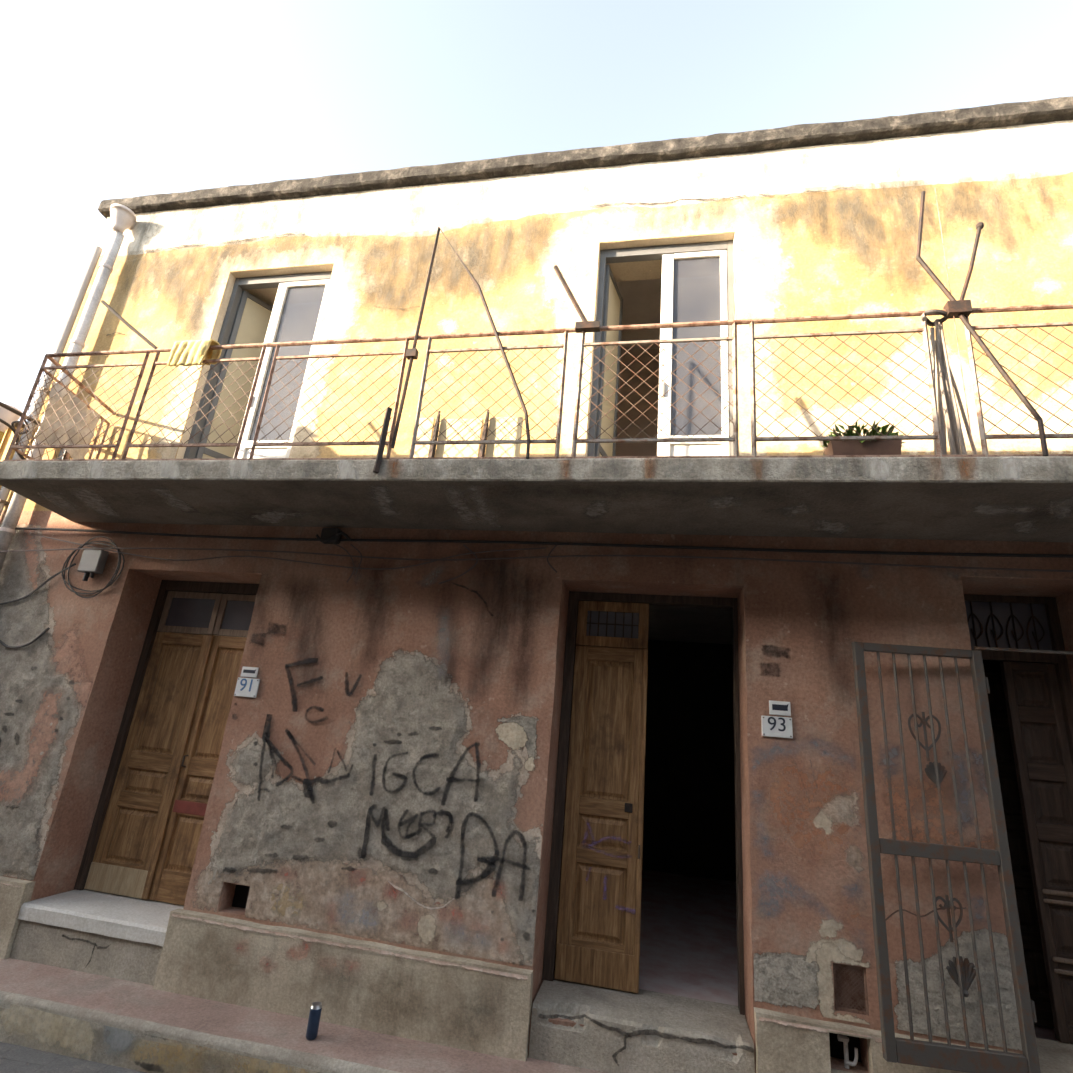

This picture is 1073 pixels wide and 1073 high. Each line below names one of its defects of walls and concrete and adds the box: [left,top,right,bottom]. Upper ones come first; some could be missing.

water stain [126,211,339,334]
water stain [358,188,549,314]
water stain [772,190,883,263]
water stain [896,168,919,280]
water stain [943,186,1014,247]
spalling [0,523,92,880]
spalling [194,649,543,966]
peeling [768,765,863,872]
spalling [754,910,870,1025]
crack [538,1014,754,1065]